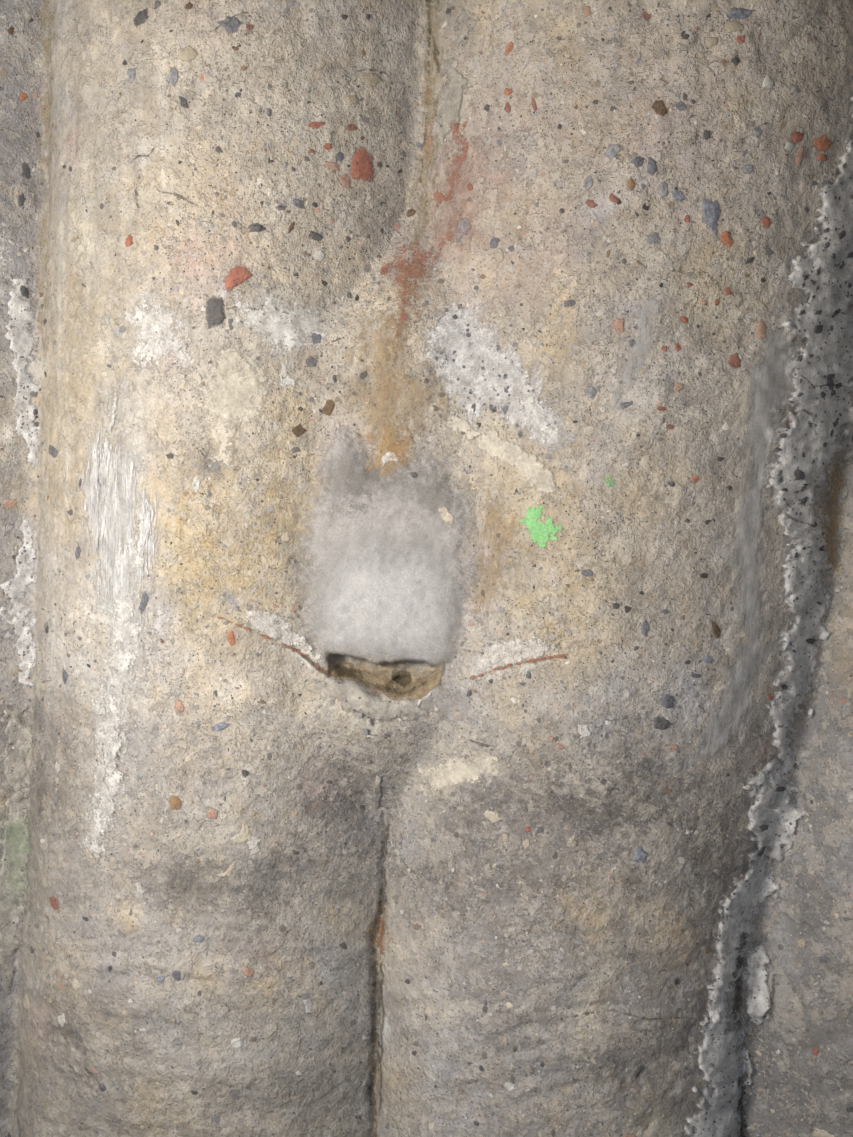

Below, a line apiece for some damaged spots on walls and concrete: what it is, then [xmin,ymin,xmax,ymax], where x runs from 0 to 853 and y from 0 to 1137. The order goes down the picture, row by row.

crack [419,0,439,183]
corrosion [431,121,468,204]
corrosion [364,220,458,474]
leakage [820,463,844,571]
crack [218,602,331,678]
hole [324,643,444,707]
crack [468,635,568,687]
crack [368,820,389,1137]